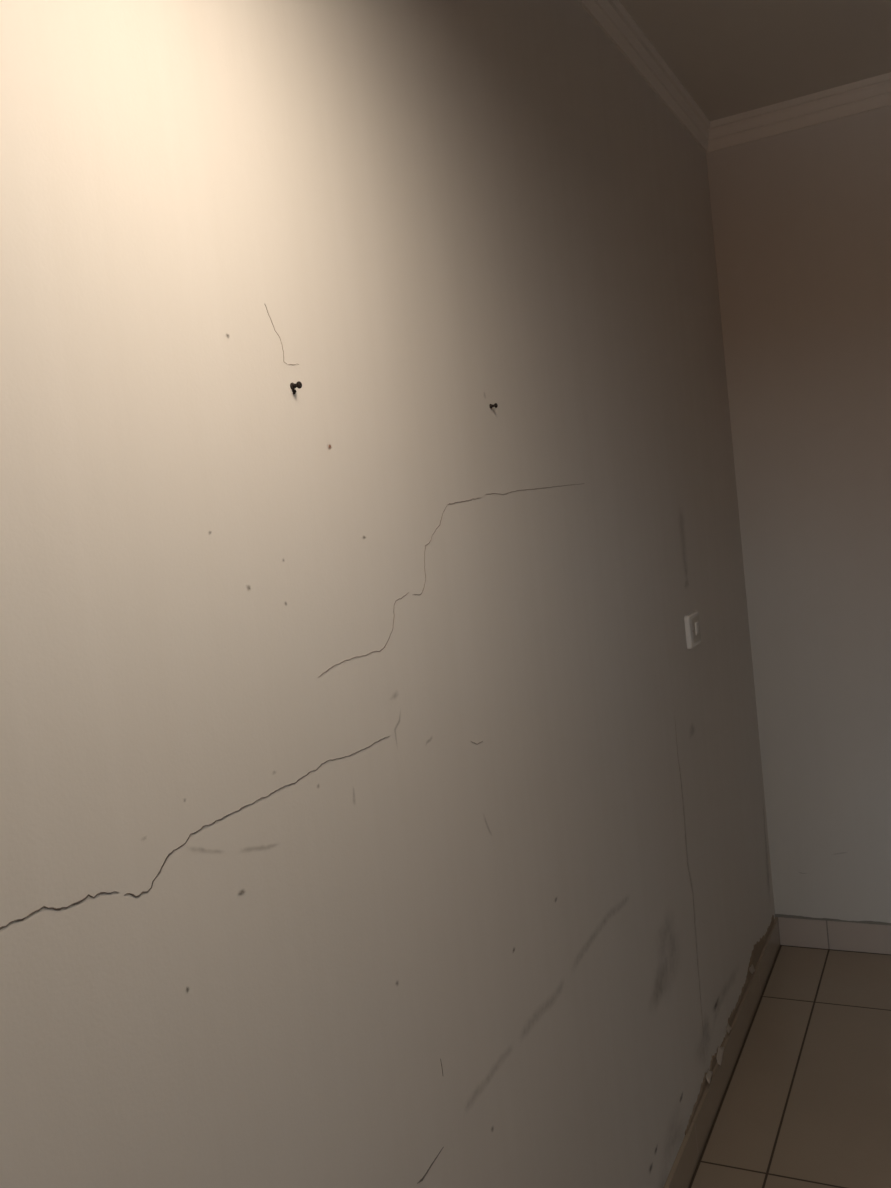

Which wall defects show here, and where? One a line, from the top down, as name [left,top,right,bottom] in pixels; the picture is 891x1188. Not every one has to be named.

crack [319,484,579,677]
crack [0,736,389,930]
peeling [685,915,774,1135]